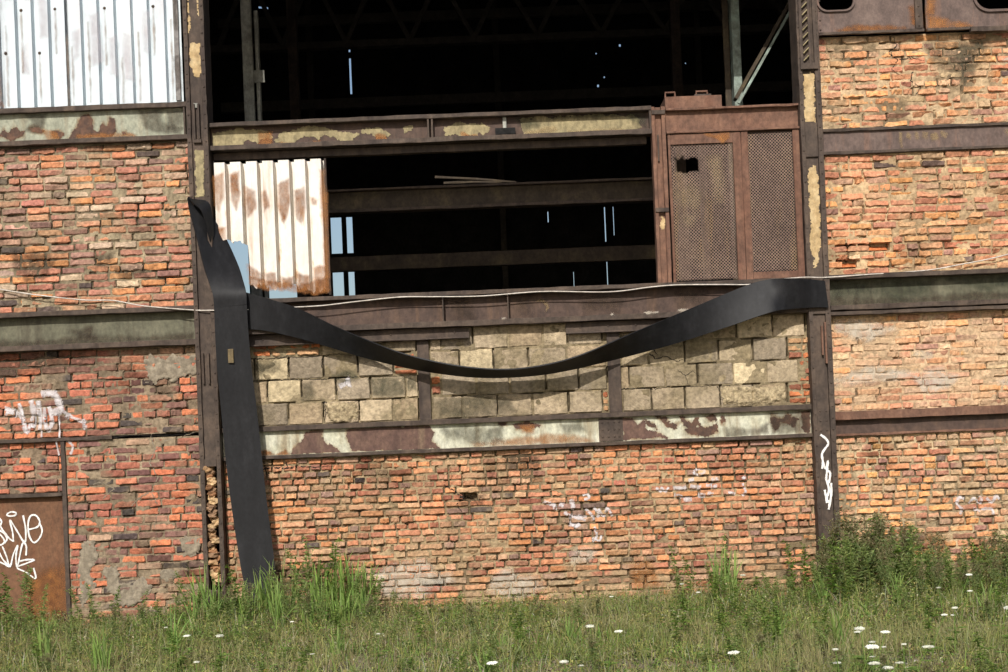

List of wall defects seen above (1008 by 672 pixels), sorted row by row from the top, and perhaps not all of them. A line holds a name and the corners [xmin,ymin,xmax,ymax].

rust [928,0,966,28]
peeling [803,72,816,122]
peeling [0,114,126,141]
peeling [443,122,490,136]
peeling [519,114,641,134]
rust [213,173,326,221]
peeling [808,165,821,268]
rust [250,242,329,295]
peeling [498,421,541,429]